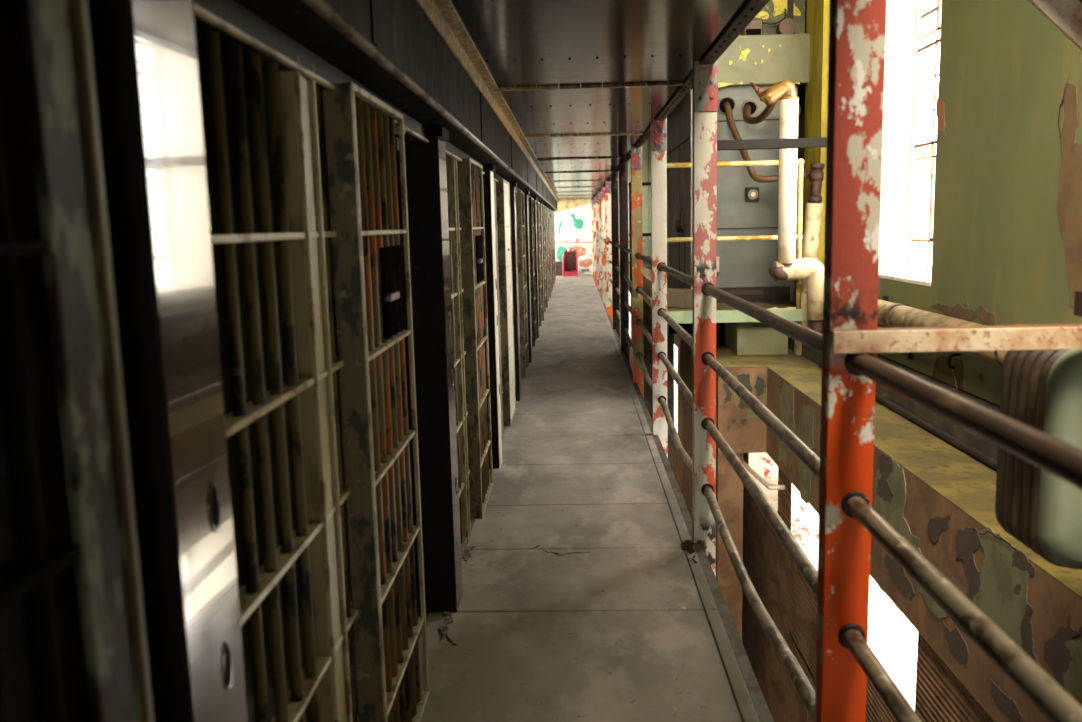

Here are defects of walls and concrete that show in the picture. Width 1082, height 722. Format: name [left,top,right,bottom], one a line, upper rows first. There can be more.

peeling [1057,83,1082,308]
peeling [914,580,949,618]
peeling [973,527,1030,649]
peeling [1062,637,1082,706]